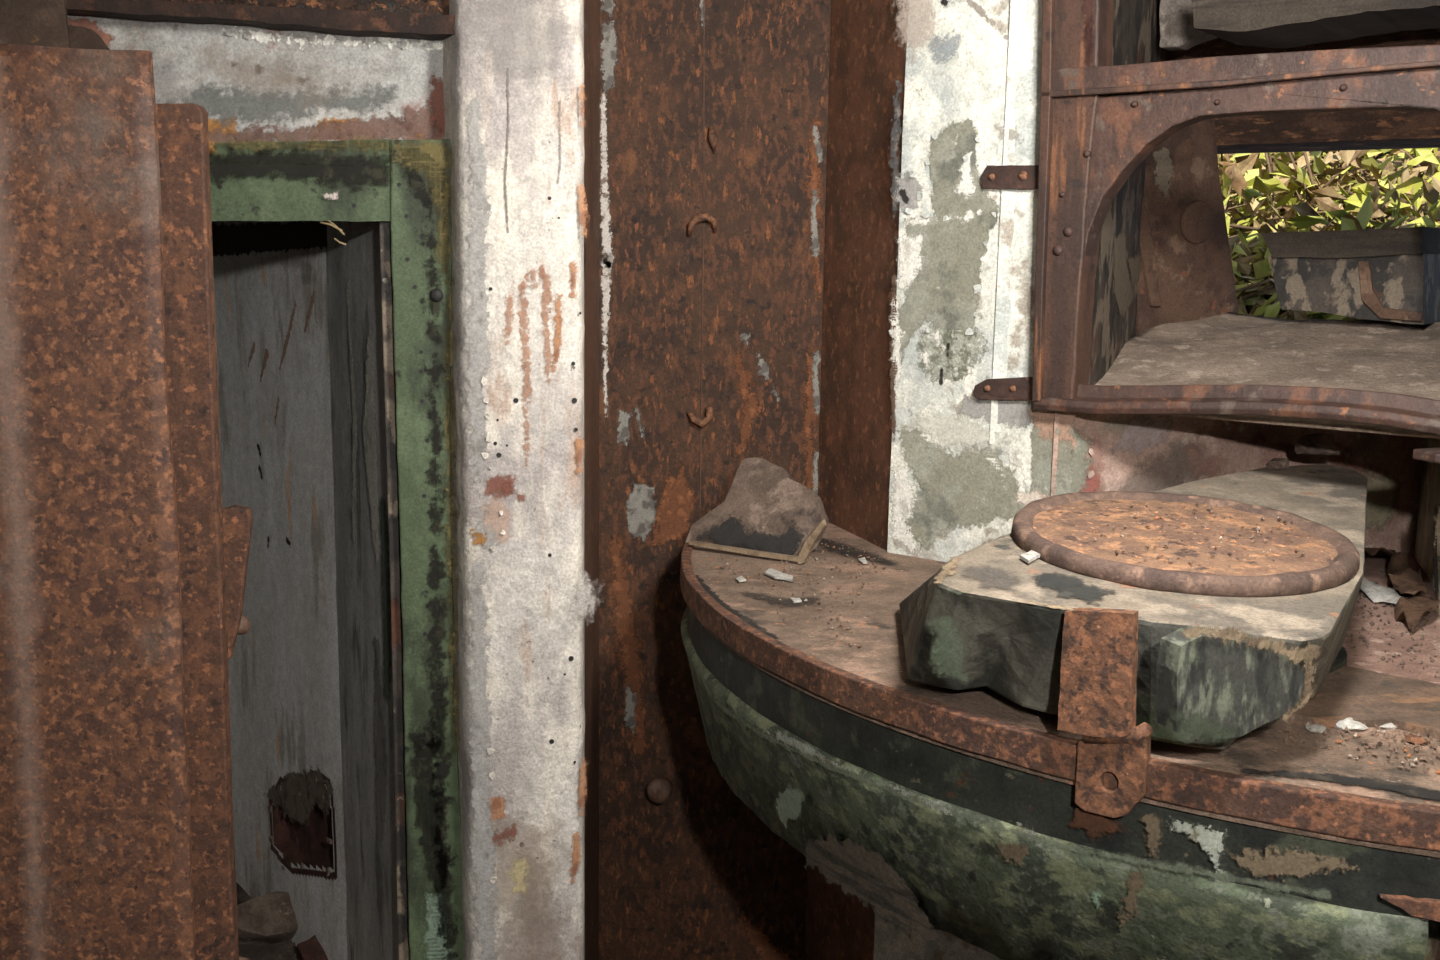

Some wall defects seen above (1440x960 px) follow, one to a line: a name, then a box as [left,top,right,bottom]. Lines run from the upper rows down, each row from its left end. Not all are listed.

peeling [67,17,115,46]
peeling [222,25,443,52]
damp [897,0,961,64]
damp [995,124,1020,140]
corrosion [577,183,590,236]
damp [888,295,907,388]
corrosion [484,261,578,541]
corrosion [574,436,584,473]
corrosion [801,345,819,491]
corrosion [650,464,697,546]
damp [889,465,925,556]
corrosion [609,536,651,759]